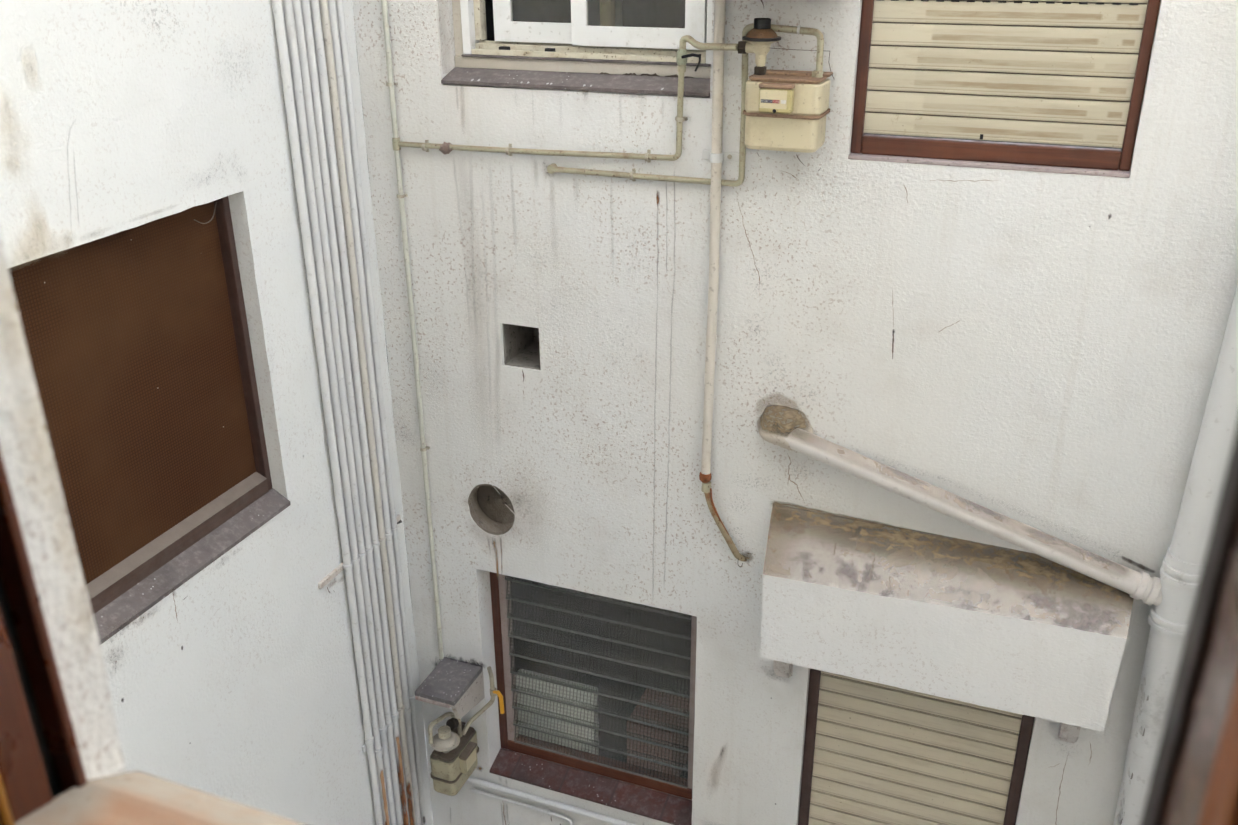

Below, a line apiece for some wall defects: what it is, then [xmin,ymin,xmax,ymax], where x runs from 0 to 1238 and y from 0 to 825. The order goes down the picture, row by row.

damp [767,501,1134,635]
damp [1080,549,1155,572]